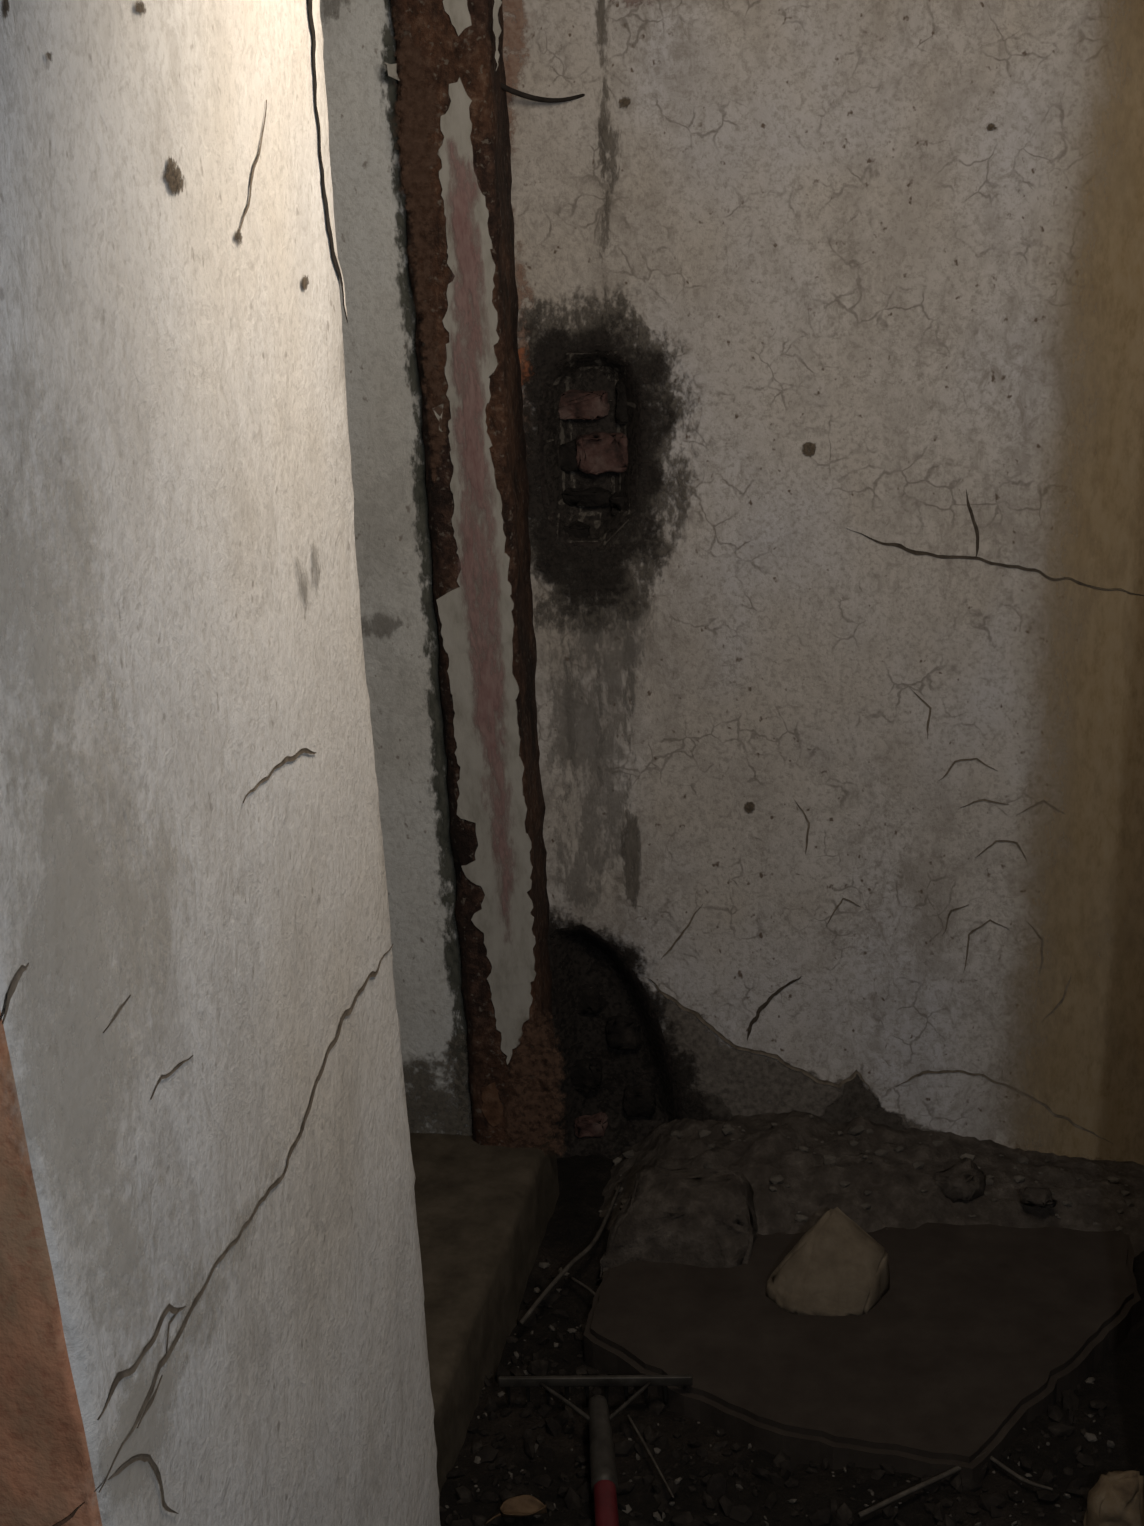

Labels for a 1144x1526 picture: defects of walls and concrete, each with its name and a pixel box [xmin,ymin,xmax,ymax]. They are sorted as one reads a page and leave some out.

corrosion [502,0,529,137]
crack [308,0,348,323]
corrosion [515,264,534,447]
spalling [537,345,644,546]
crack [849,490,1144,596]
crack [243,748,316,803]
crack [2,963,29,1024]
corrosion [504,1012,565,1156]
crack [53,944,393,1526]